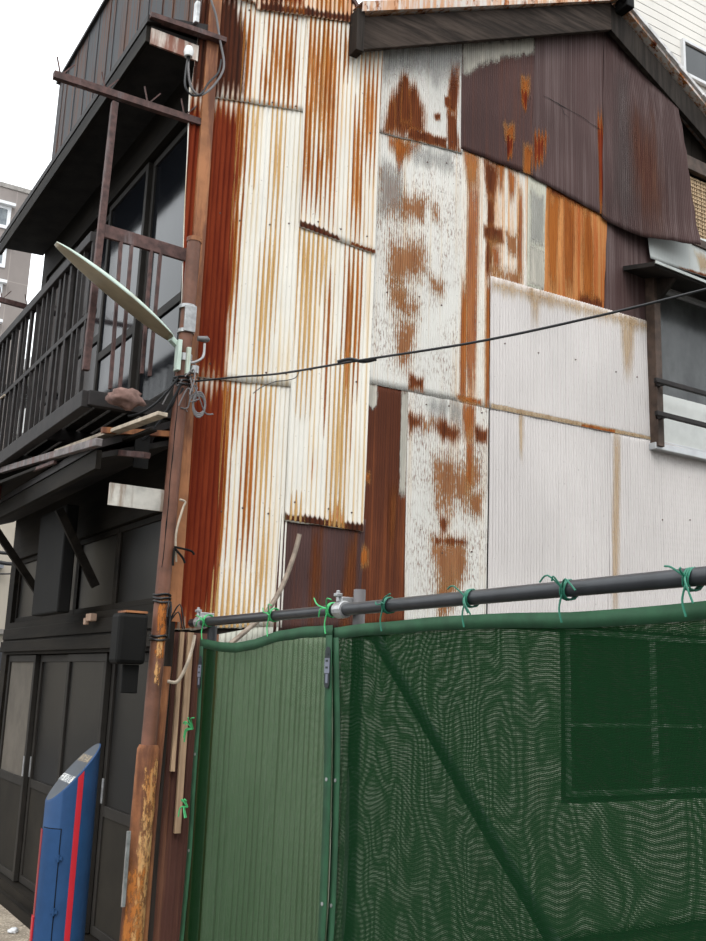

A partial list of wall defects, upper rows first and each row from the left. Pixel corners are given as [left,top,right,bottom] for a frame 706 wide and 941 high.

rust [175,0,651,628]